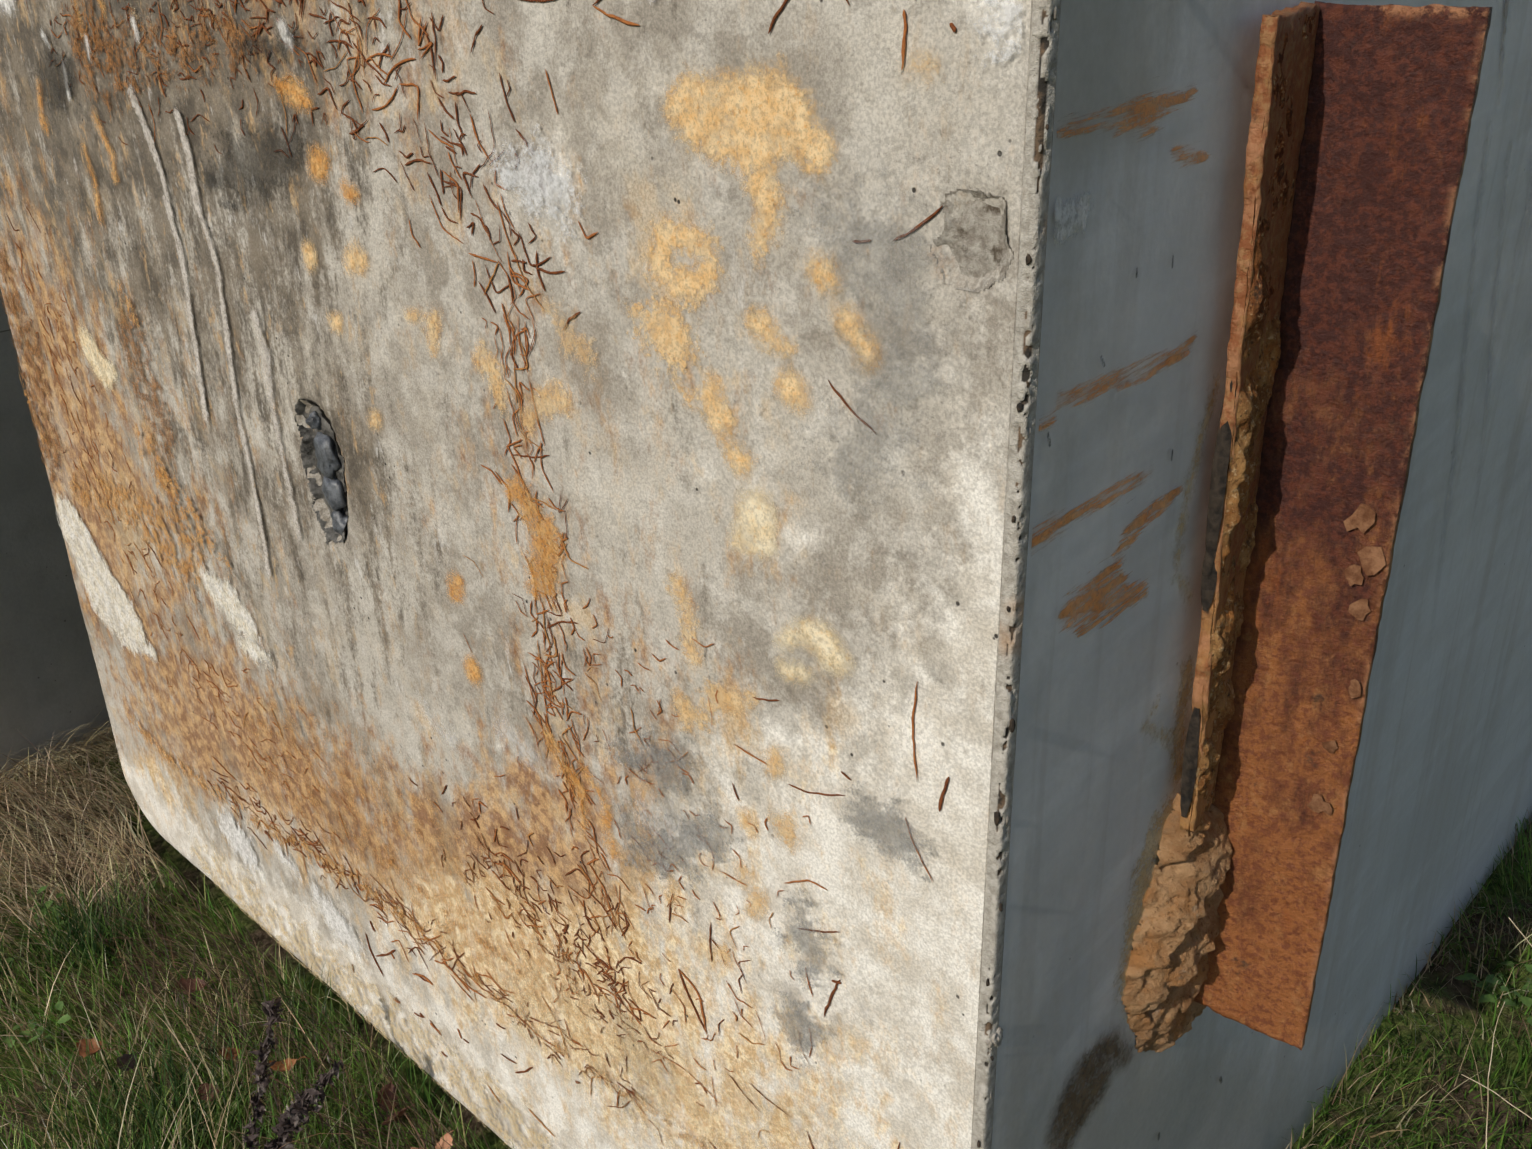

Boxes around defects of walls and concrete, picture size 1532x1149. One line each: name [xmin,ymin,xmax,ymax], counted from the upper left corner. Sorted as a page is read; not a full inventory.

rust [1057,88,1197,137]
rust [893,205,943,241]
spalling [294,398,349,544]
rust [828,380,876,434]
rust [836,309,881,371]
rust [1032,473,1142,547]
rust [1039,336,1196,431]
rust [1188,13,1316,837]
rust [0,0,851,1149]
rust [1059,486,1183,637]
rust [938,777,949,812]
damp [1048,1035,1130,1149]